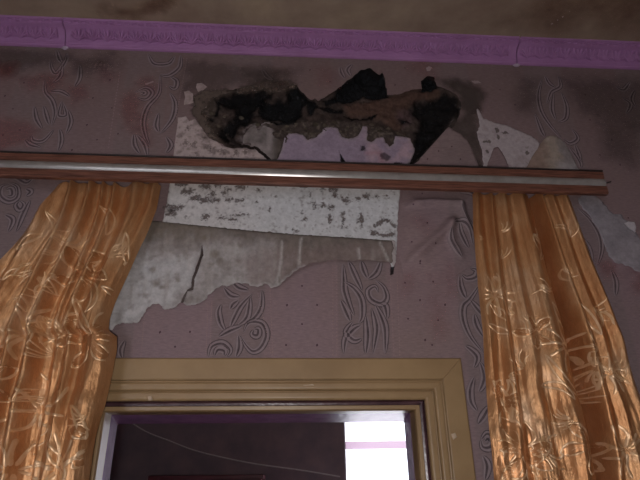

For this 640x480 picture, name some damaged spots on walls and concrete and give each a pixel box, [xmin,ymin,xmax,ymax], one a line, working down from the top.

spalling [174,66,462,164]
flaking render [477,109,578,169]
peeling [109,183,400,330]
flaking render [578,195,640,272]